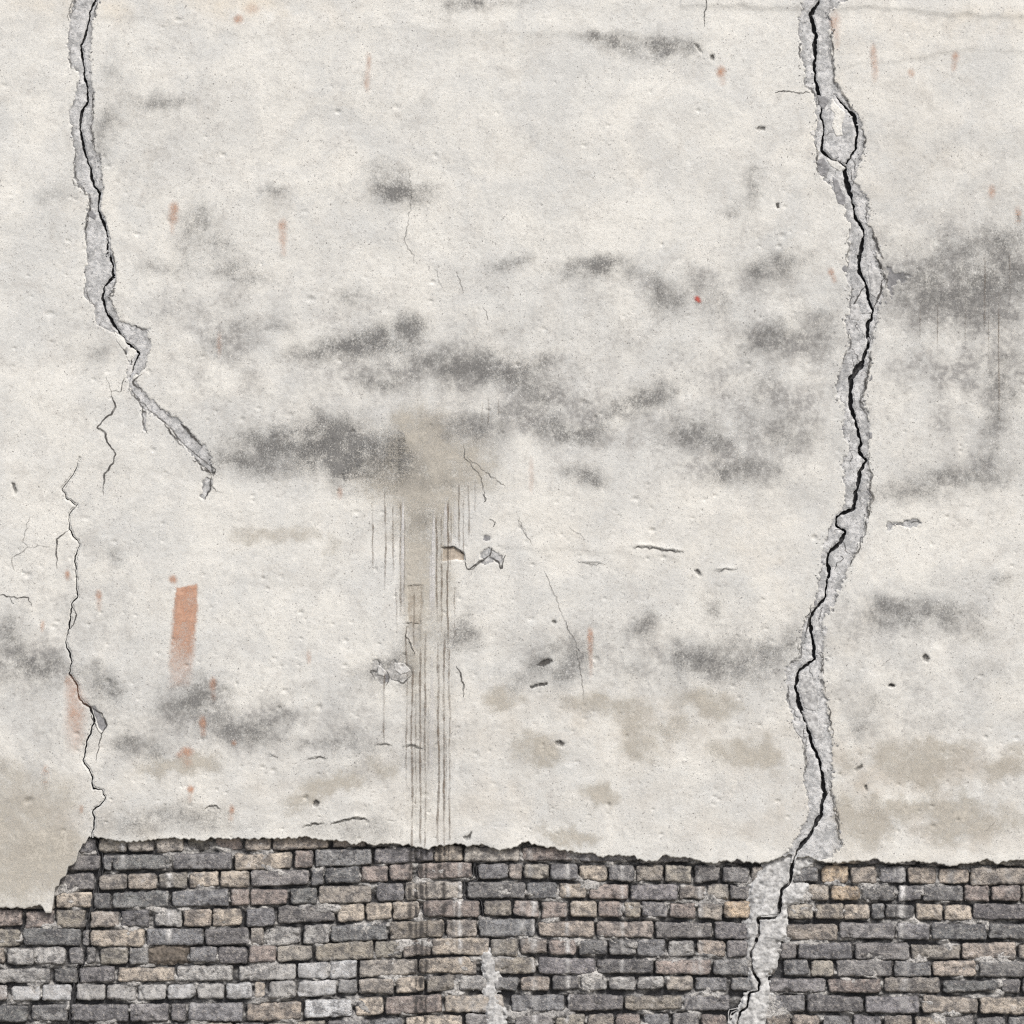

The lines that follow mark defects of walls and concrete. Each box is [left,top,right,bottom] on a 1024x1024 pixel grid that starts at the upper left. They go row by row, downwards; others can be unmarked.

crack [66,0,216,494]
water stain [900,233,1024,342]
water stain [303,315,422,358]
water stain [415,350,496,381]
water stain [679,423,726,451]
flaking render [441,519,506,570]
crack [728,0,911,1024]
corrosion [170,576,198,662]
flaking render [370,659,413,685]
crack [45,457,107,1024]
water stain [219,412,494,1022]
spalling [148,945,191,965]